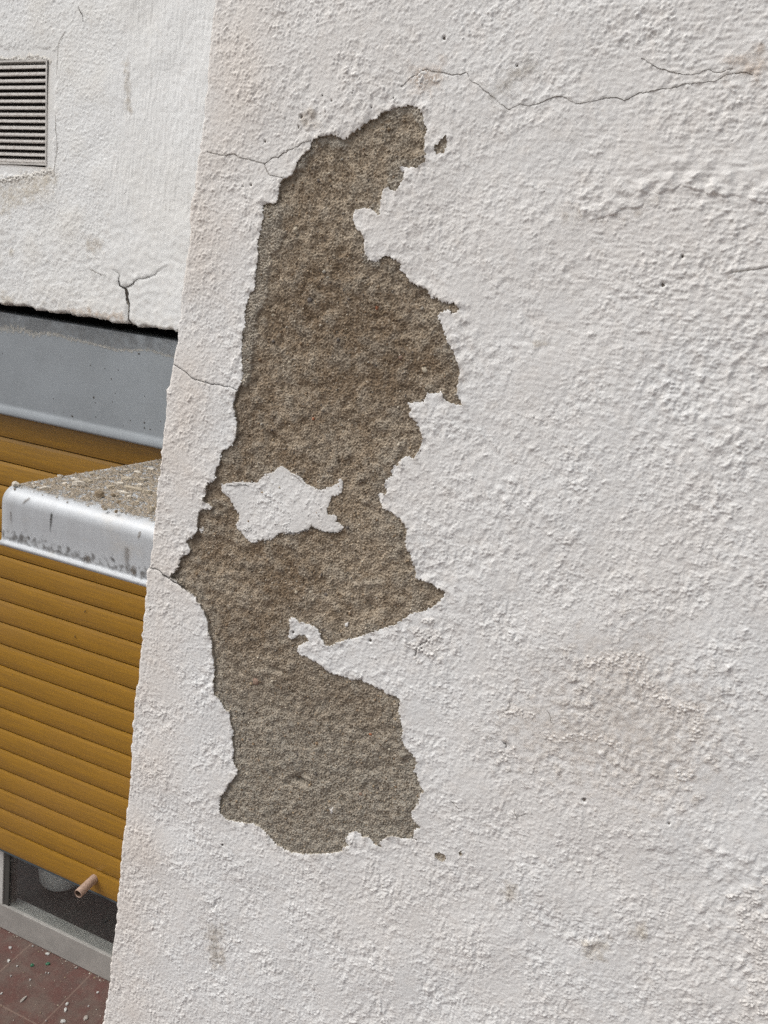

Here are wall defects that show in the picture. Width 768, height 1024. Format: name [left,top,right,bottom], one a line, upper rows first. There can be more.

crack [207,140,311,177]
crack [94,266,165,326]
flaking render [170,105,463,855]